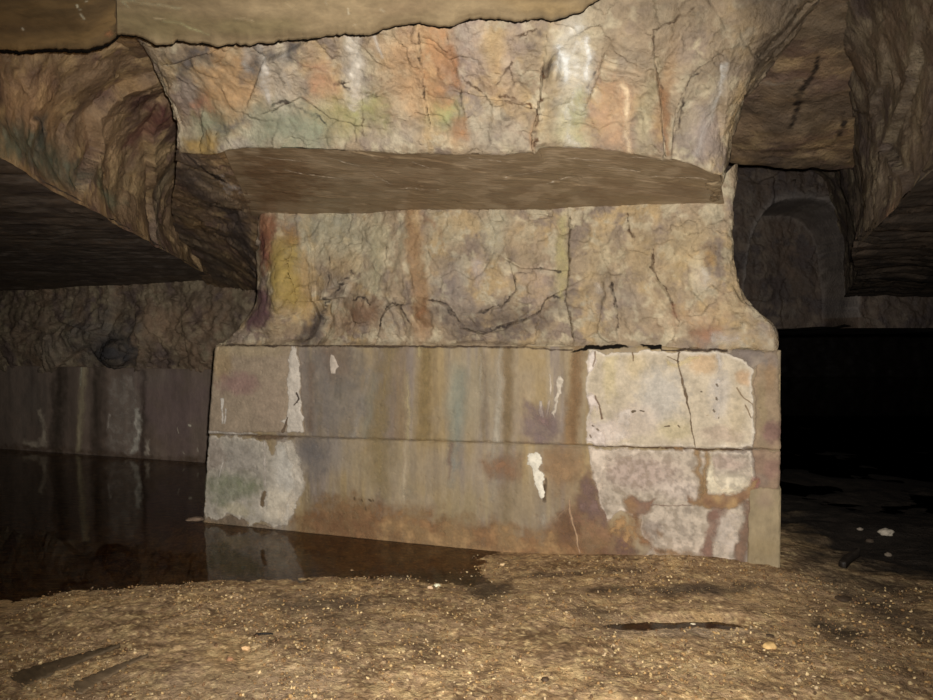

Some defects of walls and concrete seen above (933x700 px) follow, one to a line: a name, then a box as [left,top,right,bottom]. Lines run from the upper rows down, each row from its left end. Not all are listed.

crack [453,62,545,146]
crack [226,218,751,451]
flaking render [197,345,305,531]
water stain [296,472,585,555]
water stain [491,348,511,464]
flaking render [527,452,547,501]
water stain [526,352,581,445]
corrosion [688,449,759,562]